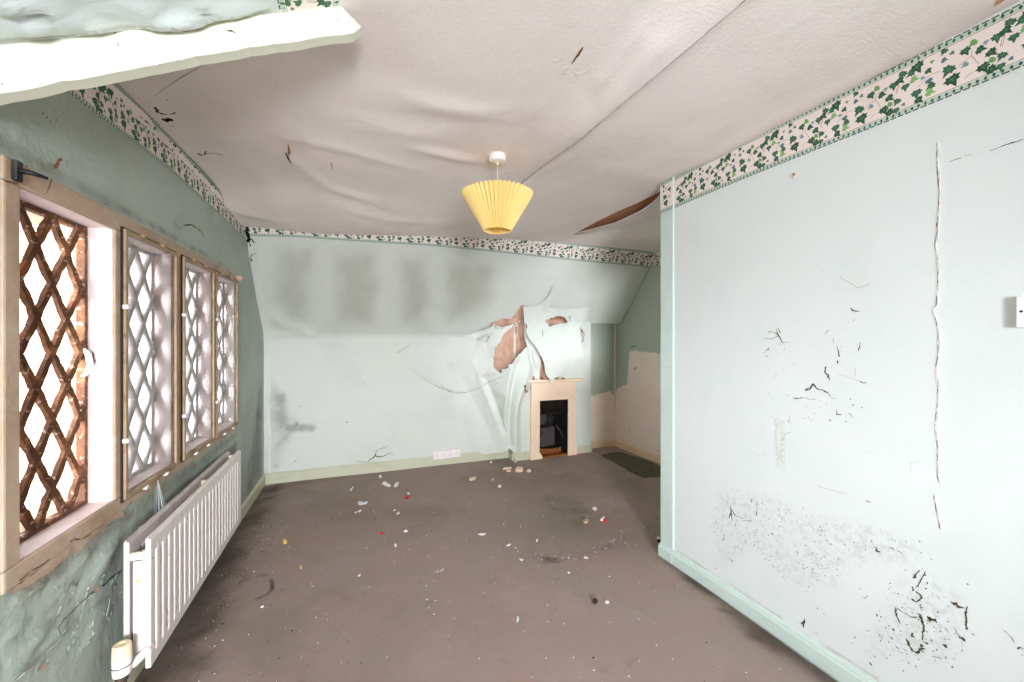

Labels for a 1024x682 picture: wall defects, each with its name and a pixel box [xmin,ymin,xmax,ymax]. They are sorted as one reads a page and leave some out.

flaking render [490,305,527,373]
flaking render [545,316,567,326]
flaking render [591,350,661,456]
leakage [715,492,974,671]